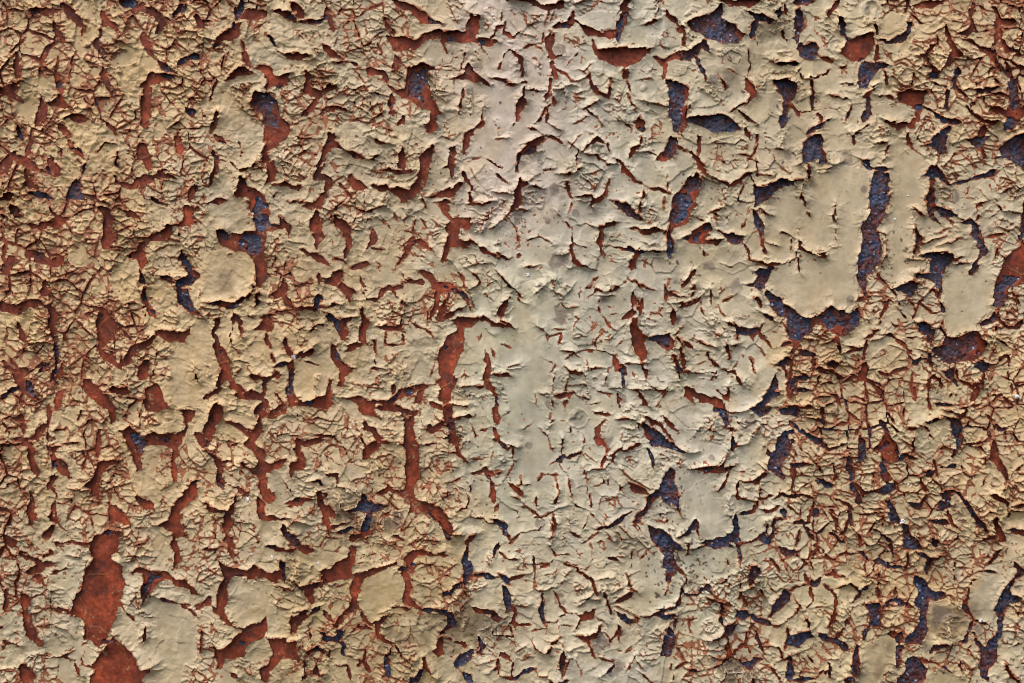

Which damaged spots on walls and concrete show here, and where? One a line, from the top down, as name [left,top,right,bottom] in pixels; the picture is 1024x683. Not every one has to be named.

peeling [169,0,341,92]
rust [658,0,748,67]
crack [780,3,788,42]
crack [0,0,275,679]
peeling [0,106,530,683]
rust [206,66,349,271]
peeling [610,382,822,566]
rust [608,167,894,358]
peeling [504,0,1024,340]
crack [670,255,1024,683]
rust [913,272,1024,367]
peeling [783,575,998,683]